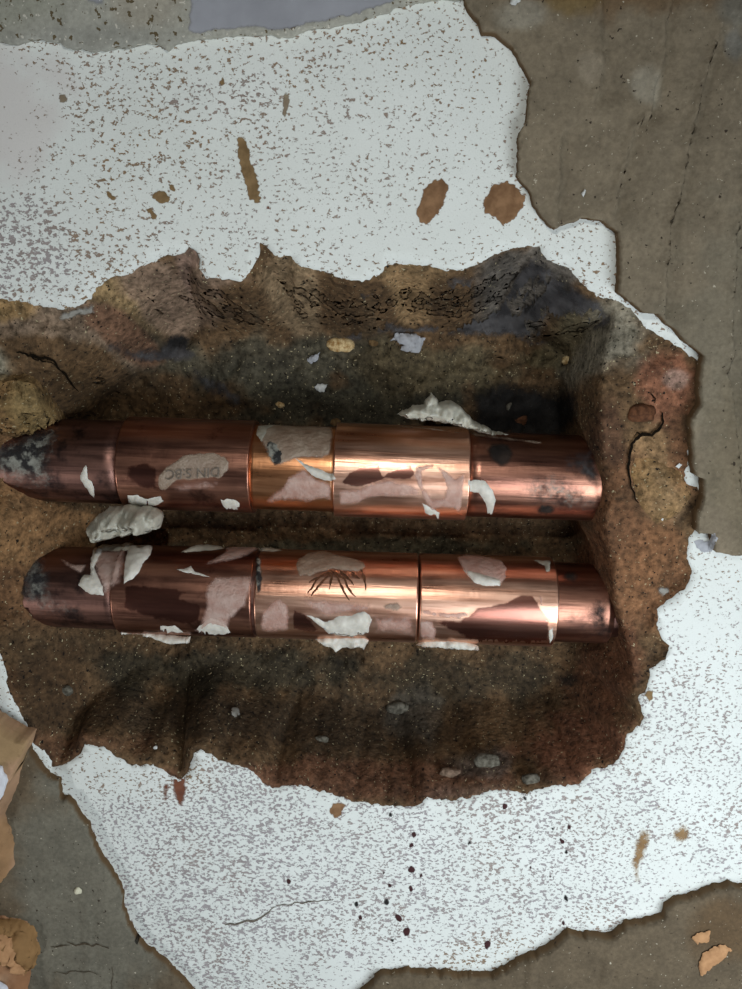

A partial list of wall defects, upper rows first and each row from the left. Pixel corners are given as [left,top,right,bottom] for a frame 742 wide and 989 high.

peeling [483,181,525,225]
crack [627,393,664,503]
spalling [0,243,718,818]
crack [0,764,23,883]
crack [225,900,330,926]
crack [0,915,113,989]
peeling [692,931,732,976]